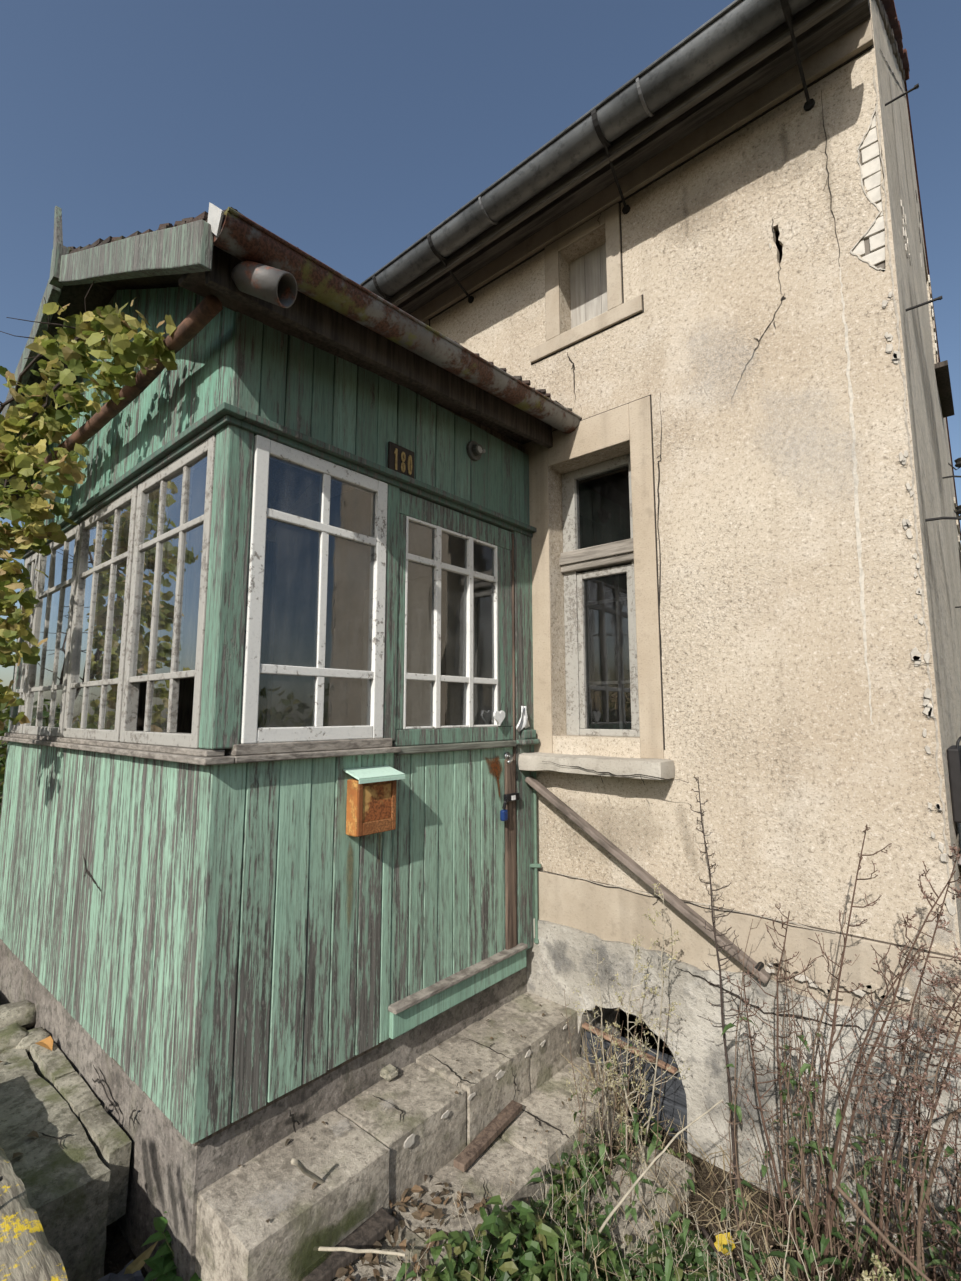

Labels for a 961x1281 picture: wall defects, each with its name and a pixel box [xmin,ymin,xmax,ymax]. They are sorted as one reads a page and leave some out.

crack [732,294,785,397]
spalling [850,66,958,956]
spalling [403,1134,415,1149]